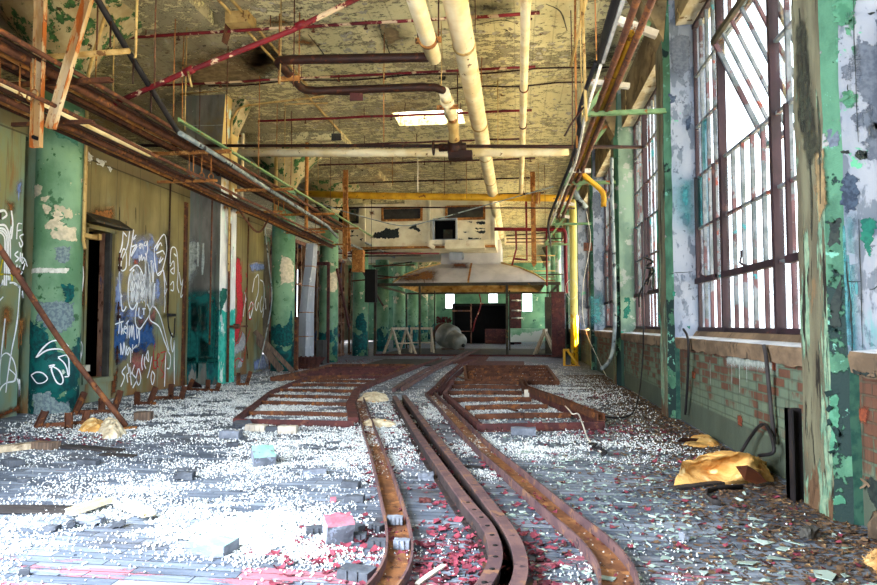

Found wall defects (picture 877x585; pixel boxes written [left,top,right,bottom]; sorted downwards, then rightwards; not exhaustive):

peeling [470,0,598,149]
spalling [670,35,690,78]
peeling [88,0,571,220]
spalling [815,0,877,257]
corrosion [93,208,113,219]
peeling [29,184,77,362]
peeling [279,255,294,285]
spalling [827,264,842,333]
peeling [272,311,294,347]
flaking render [859,407,868,423]
spalling [860,474,877,513]